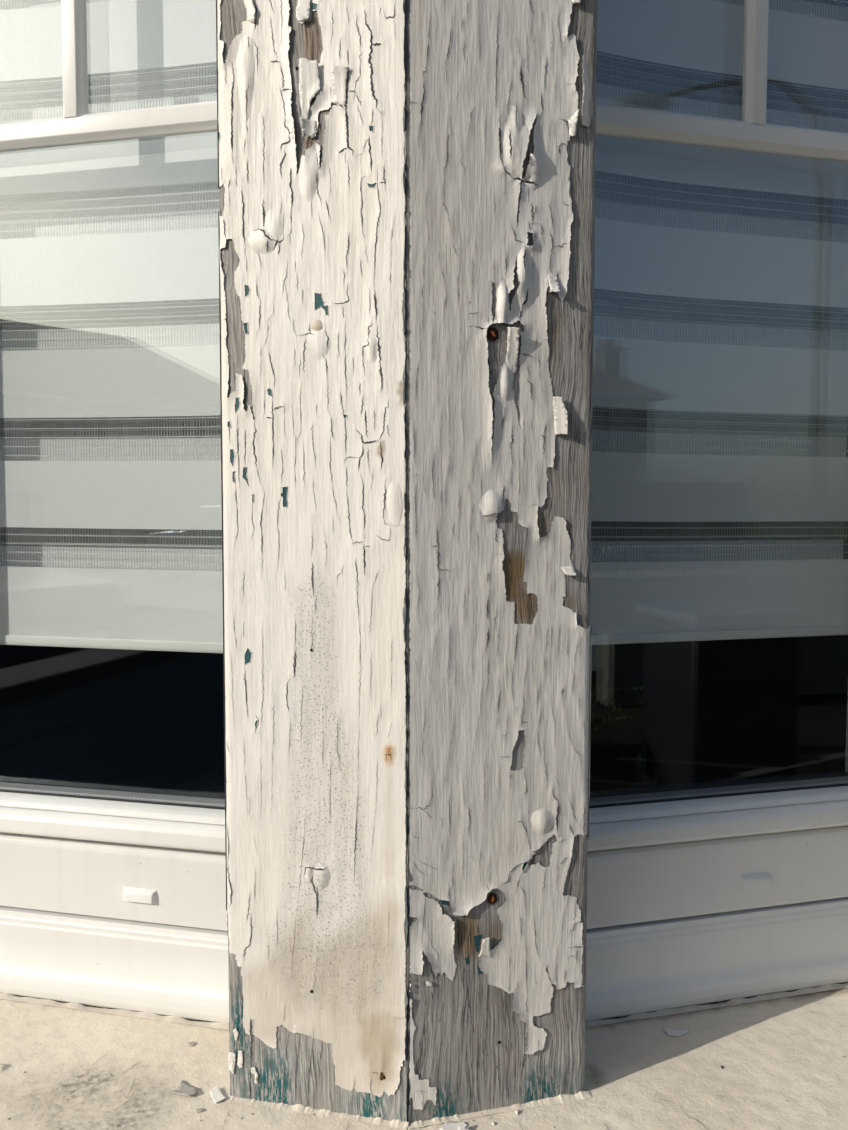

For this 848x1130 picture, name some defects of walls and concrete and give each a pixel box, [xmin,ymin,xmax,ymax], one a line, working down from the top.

peeling [220,0,256,63]
peeling [289,0,348,173]
peeling [222,239,255,428]
peeling [487,261,524,438]
peeling [496,0,596,628]
crack [221,0,586,1130]
water stain [273,590,385,1010]
peeling [209,834,586,1130]